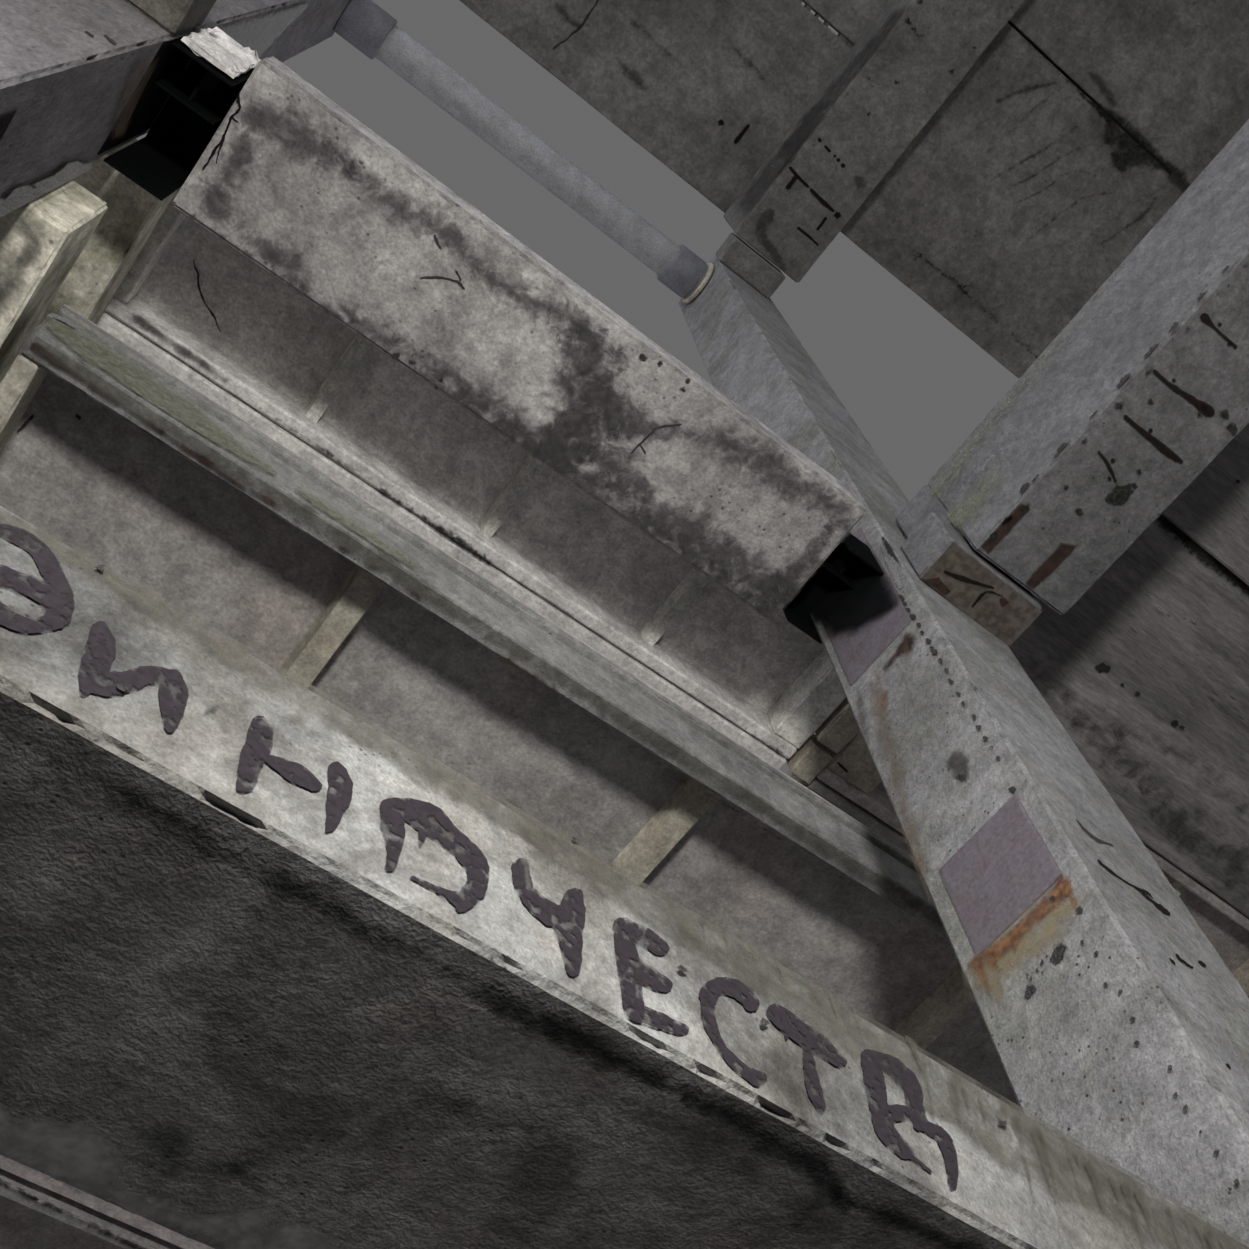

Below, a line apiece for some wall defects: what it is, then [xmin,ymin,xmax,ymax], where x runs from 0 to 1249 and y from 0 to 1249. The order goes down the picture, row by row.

crack [553,0,599,50]
crack [193,259,221,333]
leakage [205,105,850,623]
leakage [108,785,224,861]
leakage [259,868,419,953]
corrosion [969,875,1076,993]
leakage [472,988,981,1249]
leakage [0,1108,342,1249]